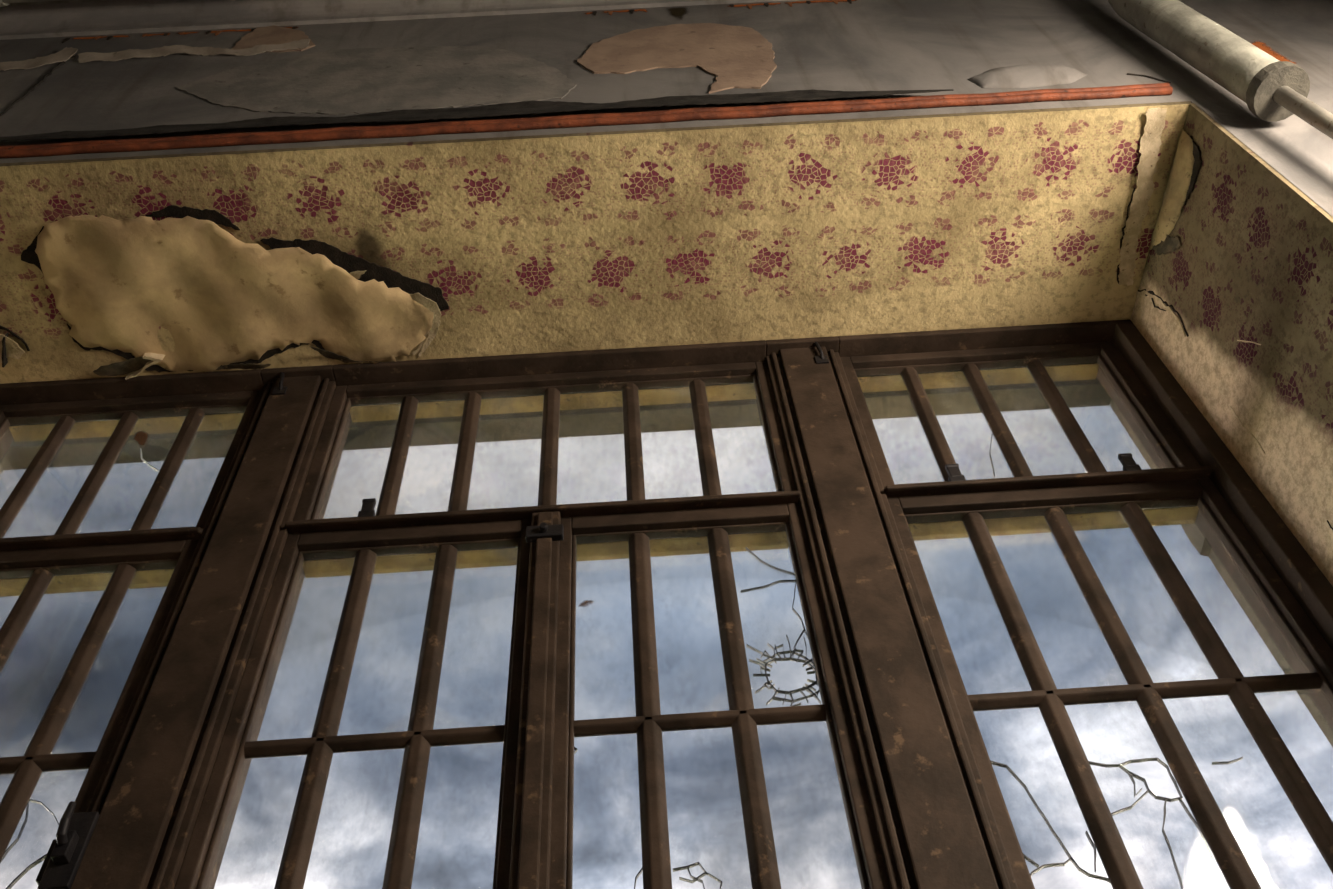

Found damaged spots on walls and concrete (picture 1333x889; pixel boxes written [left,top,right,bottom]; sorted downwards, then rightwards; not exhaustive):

peeling [309,346,378,363]
peeling [410,293,441,358]